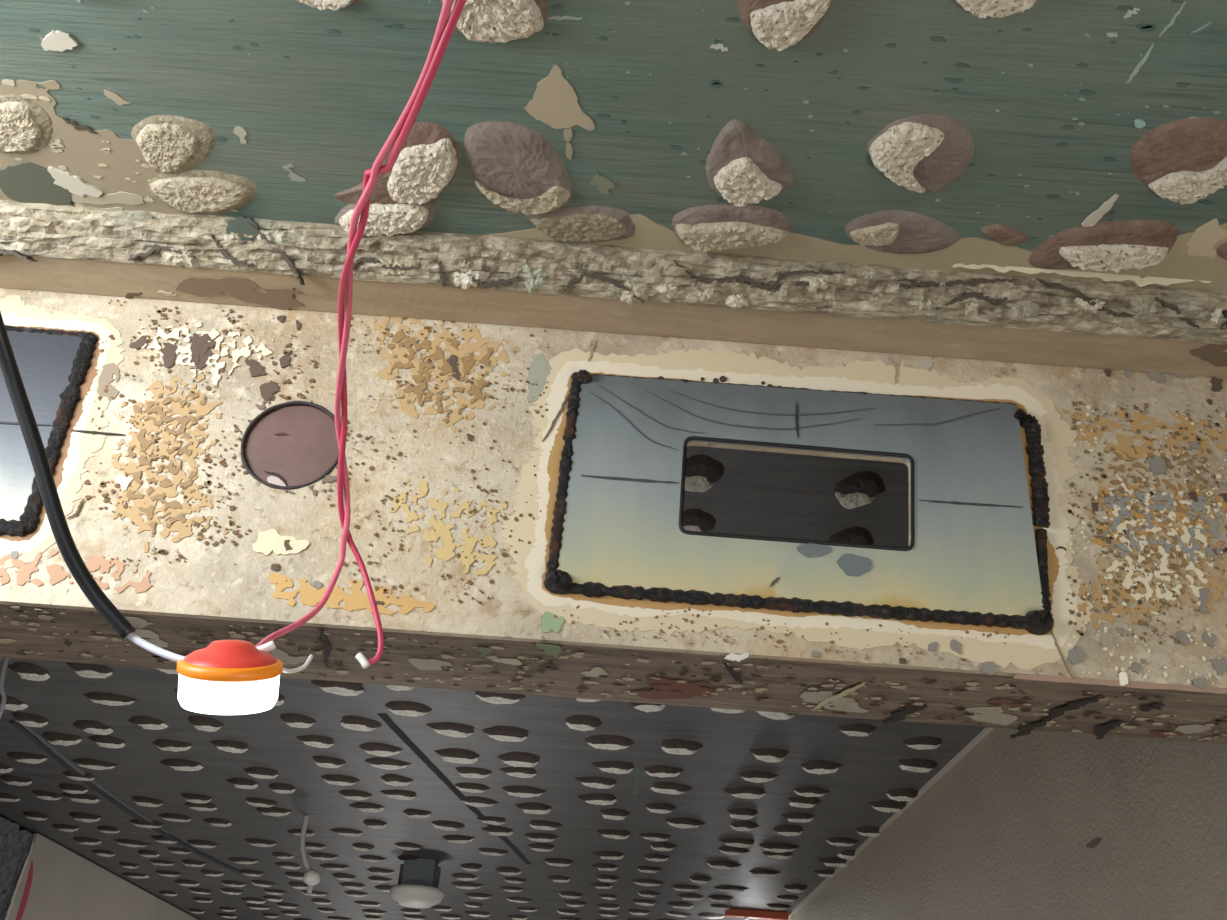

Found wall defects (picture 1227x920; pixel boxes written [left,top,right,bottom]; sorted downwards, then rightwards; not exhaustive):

spalling [0,162,103,206]
spalling [226,216,299,245]
crack [0,249,38,262]
peeling [159,243,201,269]
crack [128,223,305,311]
crack [353,257,522,288]
peeling [453,270,490,290]
peeling [620,280,678,305]
peeling [693,288,749,309]
crack [674,260,846,292]
crack [900,278,1227,330]
rust [1062,401,1227,645]